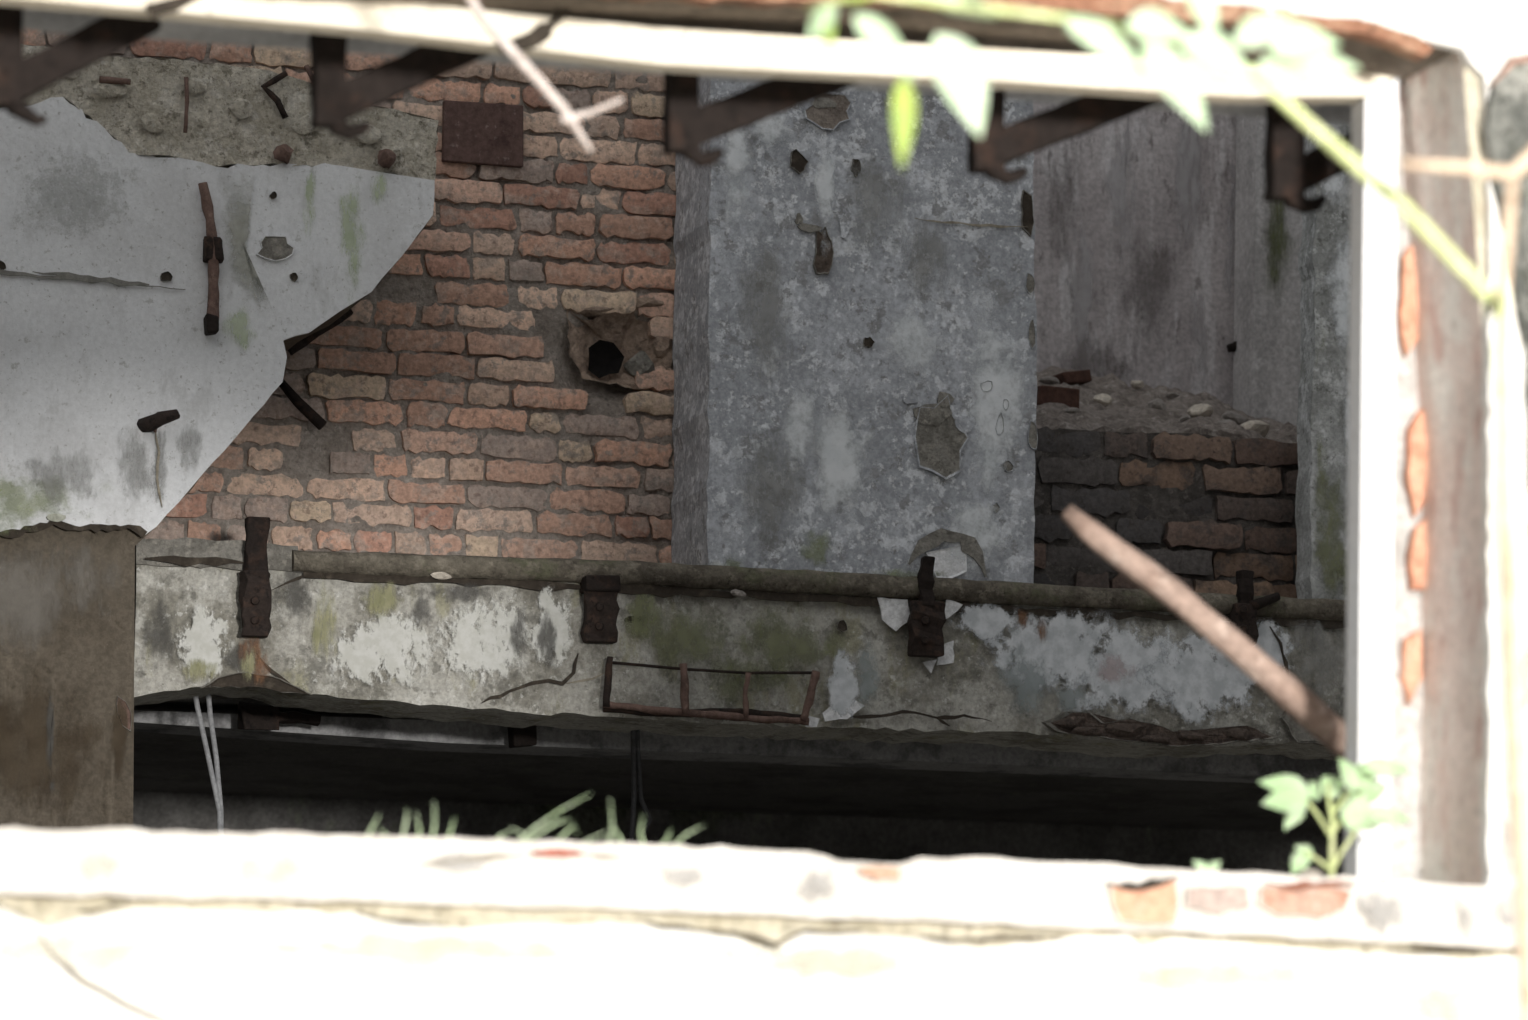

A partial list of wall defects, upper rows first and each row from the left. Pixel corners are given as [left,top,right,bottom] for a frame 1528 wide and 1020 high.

spalling [24,56,438,180]
flaking render [228,197,294,297]
spalling [1021,190,1034,237]
water stain [0,462,83,517]
peeling [783,393,872,515]
peeling [902,301,1038,578]
flaking render [1404,407,1428,591]
peeling [877,598,910,631]
spalling [602,650,864,727]
peeling [922,600,1324,747]
flaking render [1398,629,1423,706]
flaking render [1105,875,1360,927]